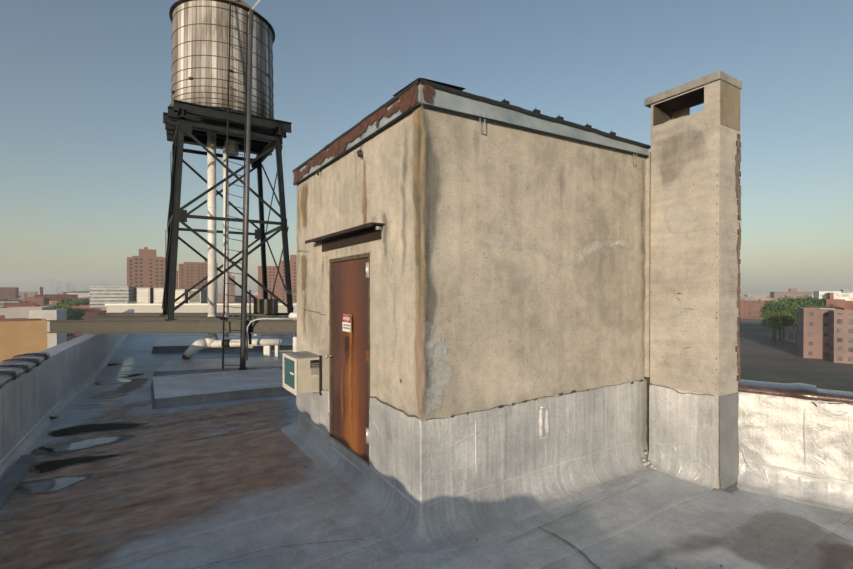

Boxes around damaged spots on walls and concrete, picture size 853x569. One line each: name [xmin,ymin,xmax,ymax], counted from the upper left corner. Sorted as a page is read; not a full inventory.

corrosion [293,84,435,414]
peeling [423,322,454,415]